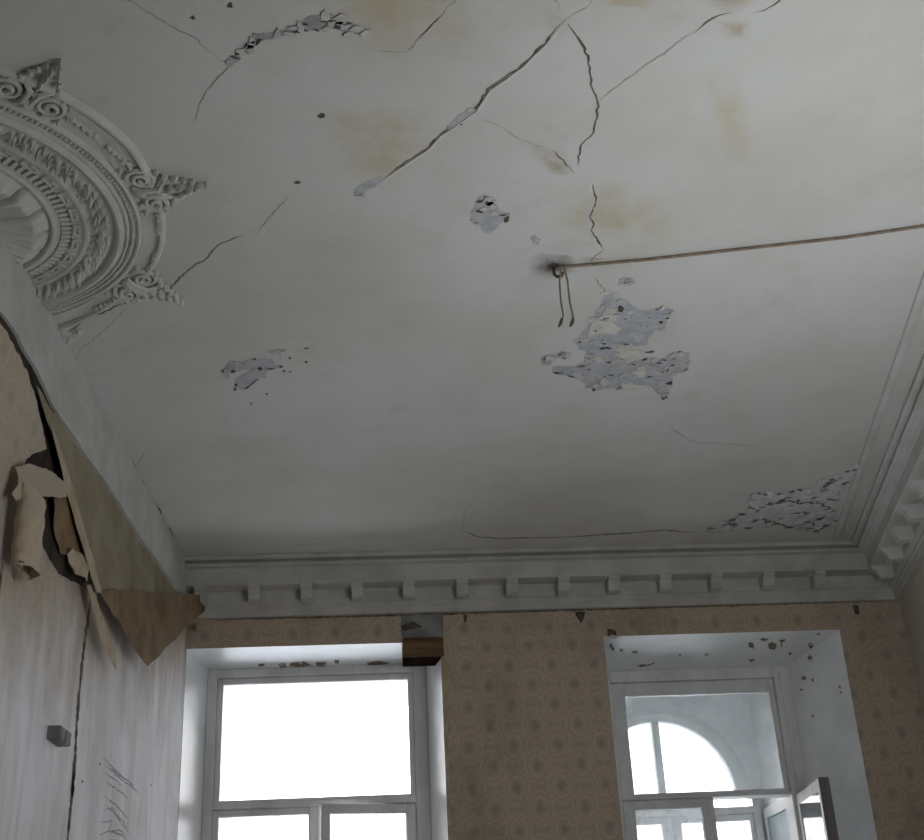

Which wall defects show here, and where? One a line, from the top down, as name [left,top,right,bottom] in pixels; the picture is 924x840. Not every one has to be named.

peeling [226,10,372,67]
crack [380,0,732,292]
peeling [470,193,510,234]
peeling [541,277,692,400]
peeling [221,349,292,391]
peeling [702,463,859,535]
peeling [37,386,205,670]
spalling [607,628,638,654]
peeling [748,638,792,663]